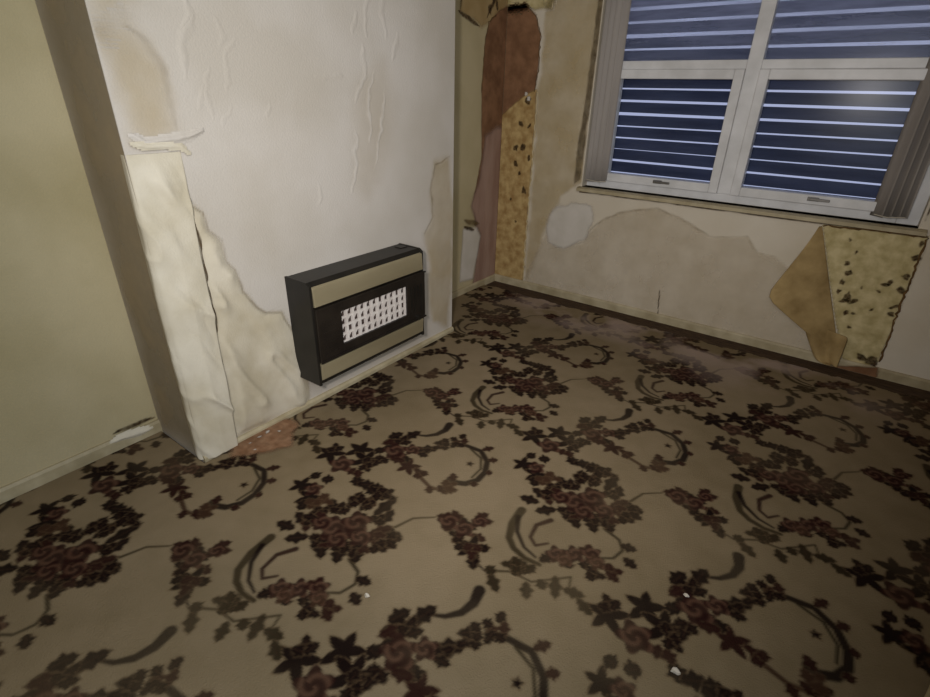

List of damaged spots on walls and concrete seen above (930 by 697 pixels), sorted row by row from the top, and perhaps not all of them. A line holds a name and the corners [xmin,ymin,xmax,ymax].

spalling [459,0,554,283]
crack [195,223,218,333]
water stain [541,203,593,248]
peeling [769,225,929,367]